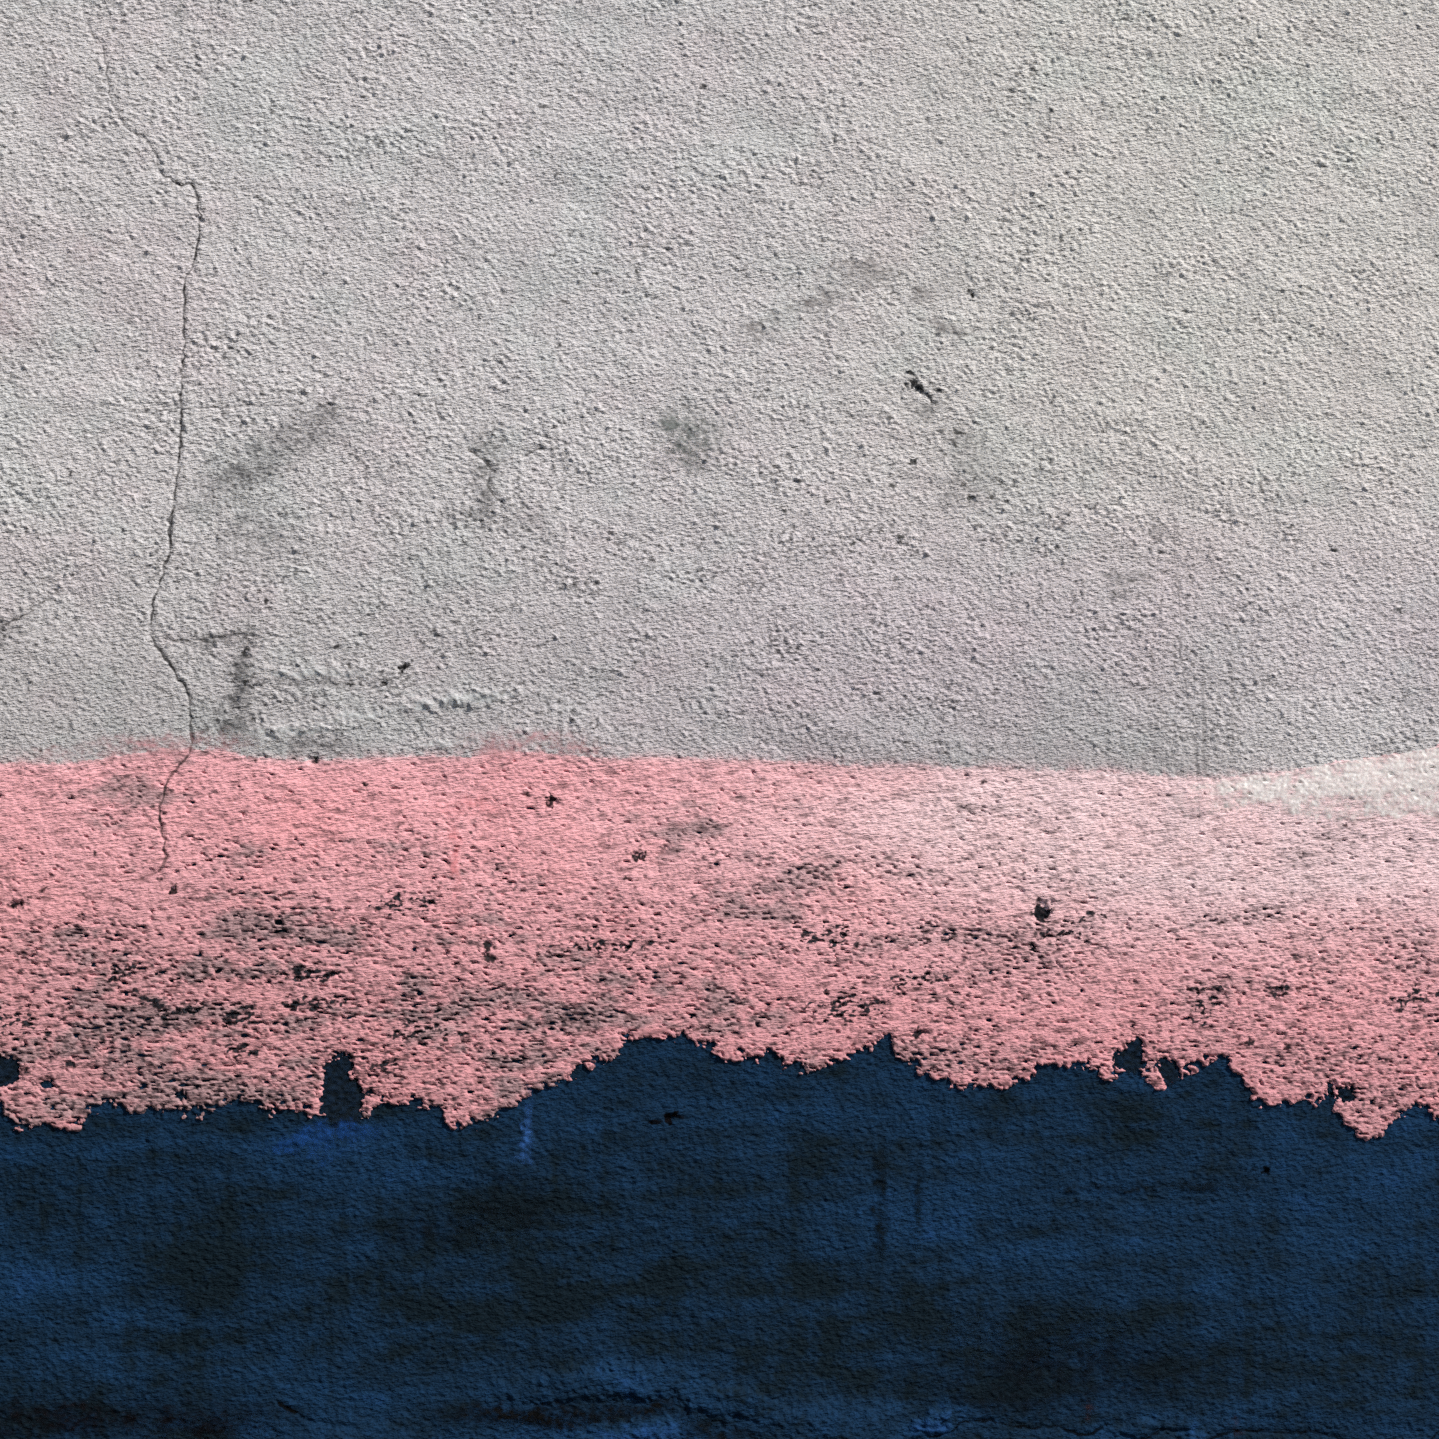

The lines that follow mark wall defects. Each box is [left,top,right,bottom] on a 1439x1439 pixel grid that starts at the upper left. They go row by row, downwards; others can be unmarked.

crack [151,172,216,871]